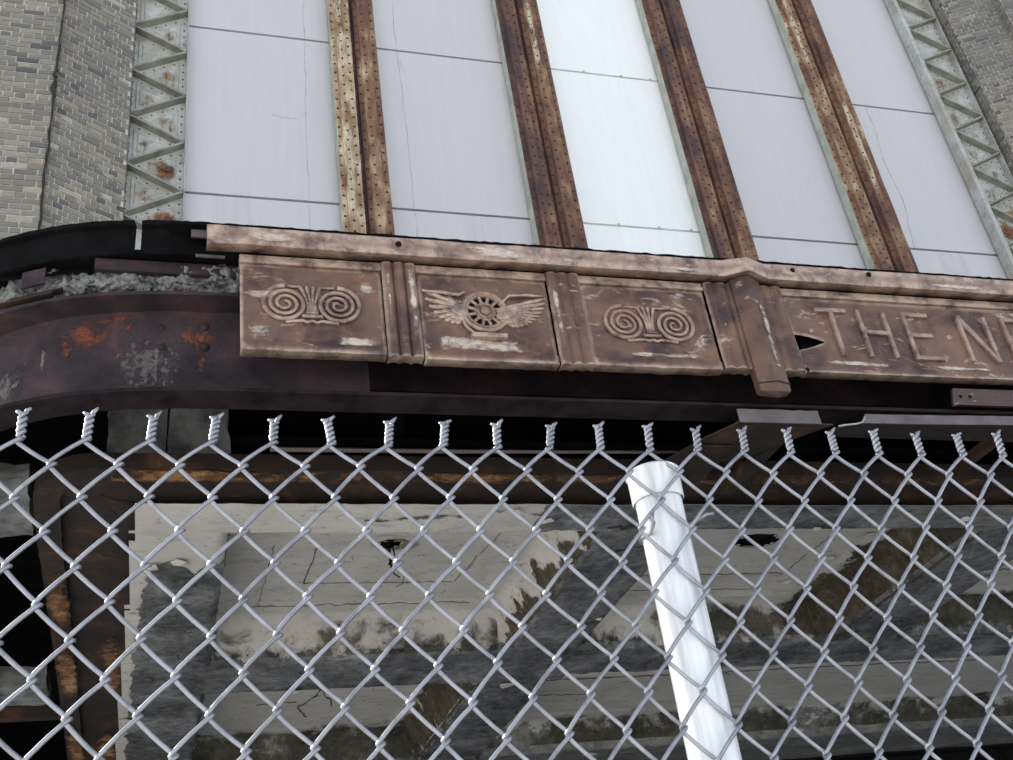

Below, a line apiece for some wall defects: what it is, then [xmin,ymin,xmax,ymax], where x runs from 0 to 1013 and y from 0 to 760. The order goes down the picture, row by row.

rust [156,162,174,179]
rust [1001,211,1013,239]
spalling [0,262,240,311]
crack [250,533,500,607]
leakage [707,601,825,638]
leakage [896,590,1013,638]
rust [55,648,77,694]
rust [102,645,121,689]
rust [98,733,115,760]
leakage [532,712,683,751]
leakage [732,705,796,738]
leakage [818,692,1013,734]